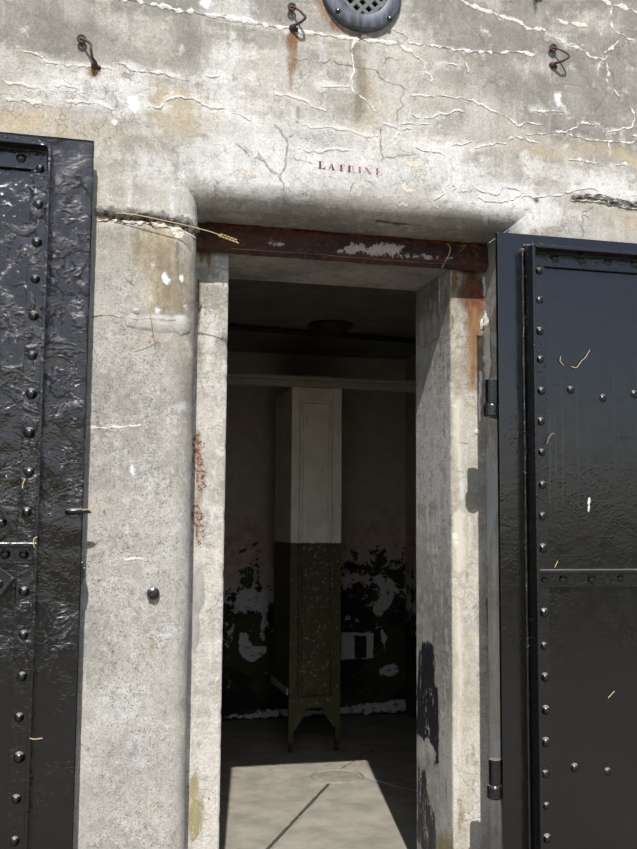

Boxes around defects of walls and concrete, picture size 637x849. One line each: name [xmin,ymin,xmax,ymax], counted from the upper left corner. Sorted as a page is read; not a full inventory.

crack [0,50,251,121]
rust [287,32,297,84]
crack [116,0,637,236]
spalling [337,242,454,260]
rust [451,270,485,385]
rust [192,434,206,492]
rust [191,505,205,548]
peeling [238,591,270,662]
peeling [341,565,395,660]
peeling [379,663,399,677]